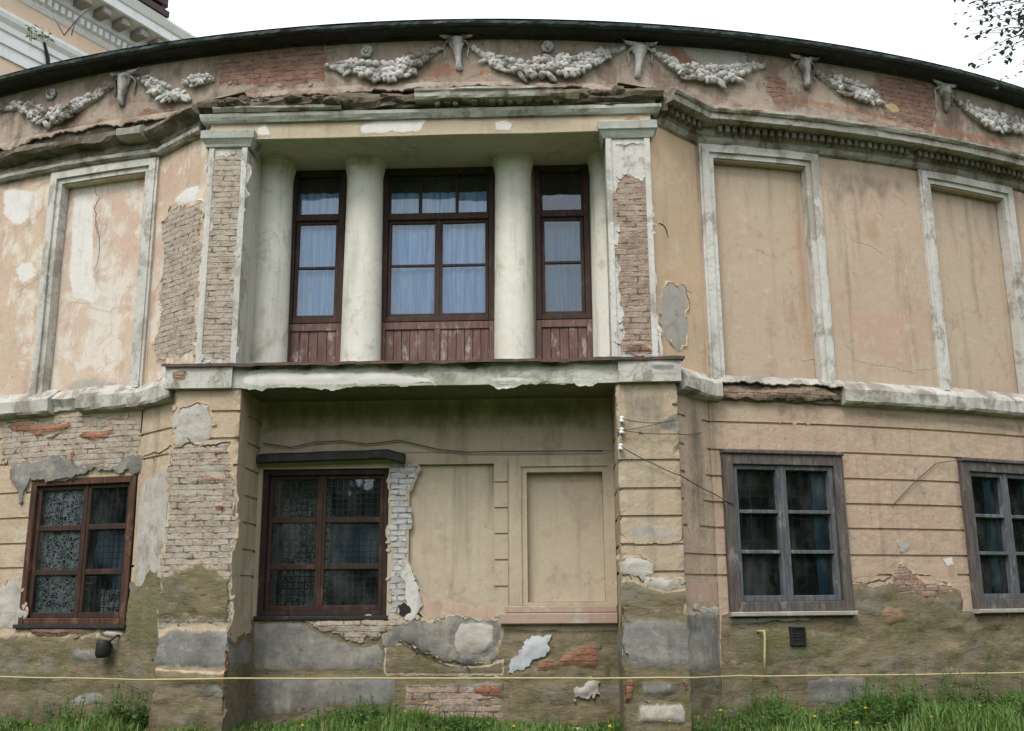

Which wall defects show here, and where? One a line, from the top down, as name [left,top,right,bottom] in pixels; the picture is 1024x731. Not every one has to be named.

spalling [370,92,414,105]
spalling [579,85,625,98]
flaking render [150,150,252,384]
flaking render [613,171,690,374]
peeling [240,369,439,391]
peeling [483,374,614,390]
flaking render [0,412,142,474]
flaking render [134,401,242,627]
peeling [615,519,720,673]
peeling [851,540,958,599]
spalling [304,558,634,725]